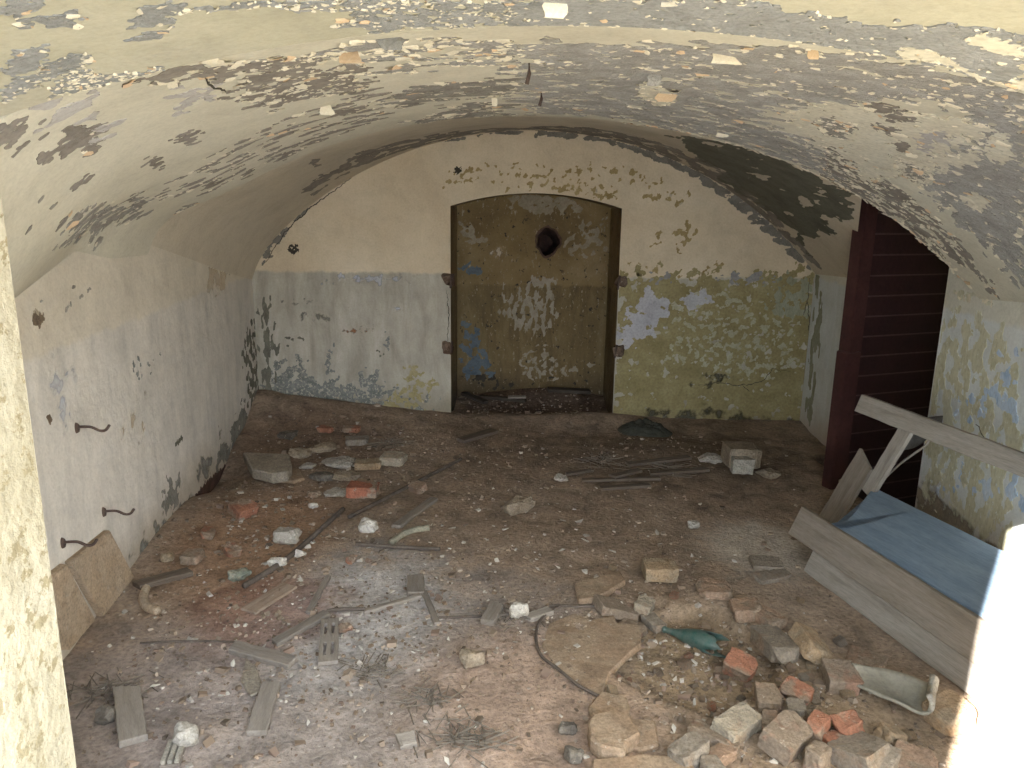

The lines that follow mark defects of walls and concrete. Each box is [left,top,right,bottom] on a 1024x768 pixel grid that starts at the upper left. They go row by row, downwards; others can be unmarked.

peeling [0,0,1024,426]
peeling [930,305,1024,451]
spalling [195,463,227,496]
peeling [917,440,1024,559]